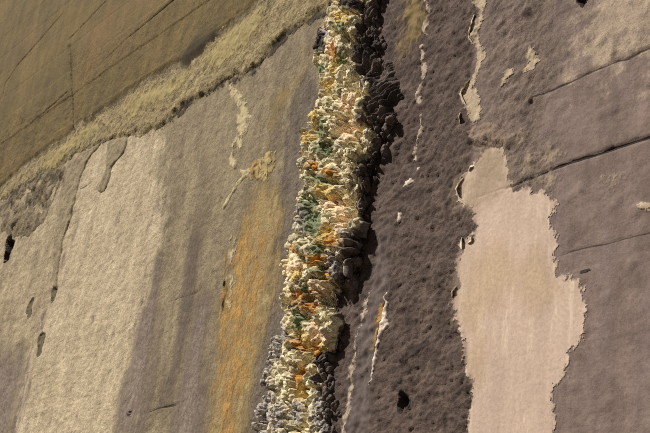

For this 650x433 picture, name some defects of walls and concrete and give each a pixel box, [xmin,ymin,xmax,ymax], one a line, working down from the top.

corrosion [206,175,285,433]
water stain [251,0,404,433]
peeling [450,0,590,433]
crack [512,136,650,187]
crack [532,48,650,97]
crack [563,232,650,255]